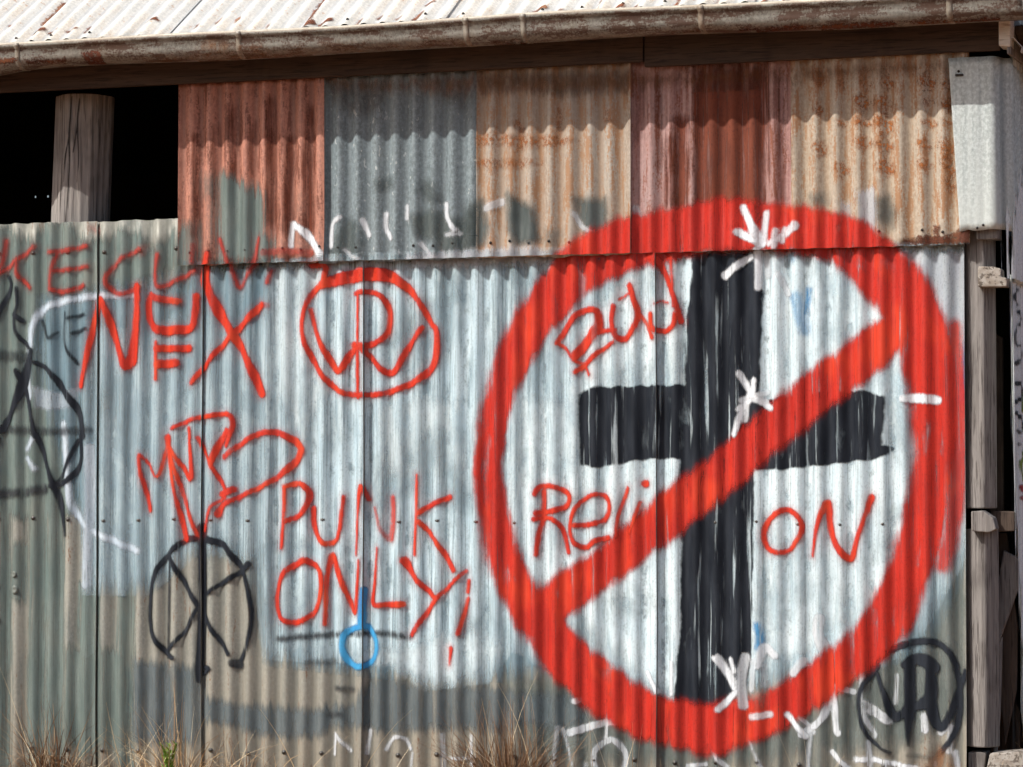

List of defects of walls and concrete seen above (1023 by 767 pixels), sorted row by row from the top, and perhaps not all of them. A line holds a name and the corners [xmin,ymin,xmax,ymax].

corrosion [265,96,315,235]
corrosion [477,120,574,167]
corrosion [665,64,780,210]
corrosion [838,76,895,174]
corrosion [917,73,956,193]
corrosion [904,225,970,245]